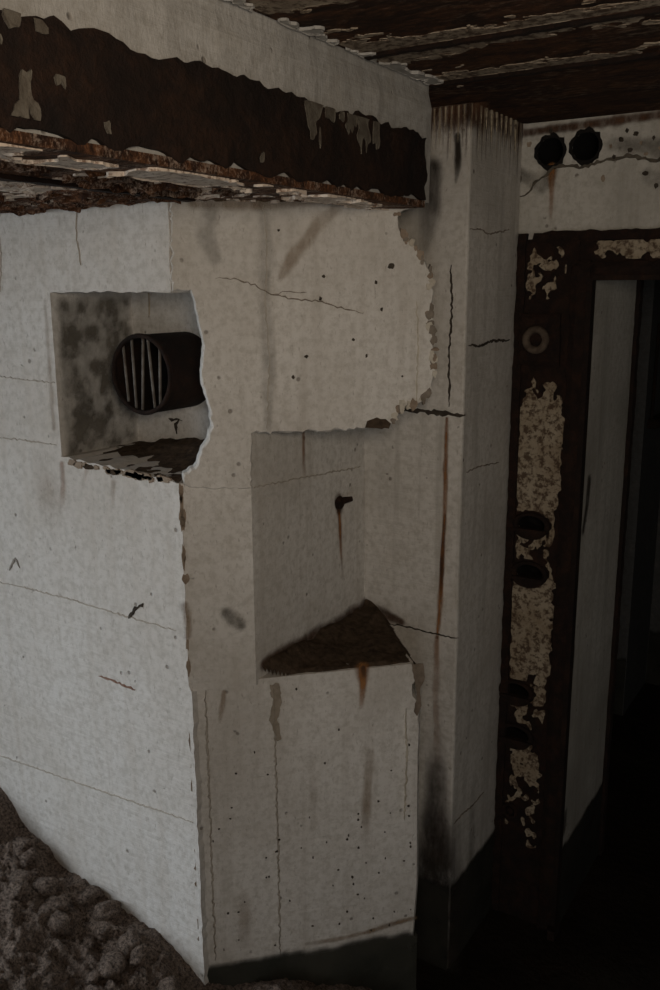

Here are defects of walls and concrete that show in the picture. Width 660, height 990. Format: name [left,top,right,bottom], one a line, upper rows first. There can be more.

peeling [246,0,660,88]
peeling [0,143,401,216]
crack [520,153,660,197]
damp [61,299,133,454]
crack [215,205,363,429]
crack [404,265,510,417]
peeling [526,246,567,299]
peeling [594,239,660,259]
corrosion [436,417,448,652]
peeling [509,377,565,730]
corrosion [358,663,368,697]
peeling [505,745,542,848]